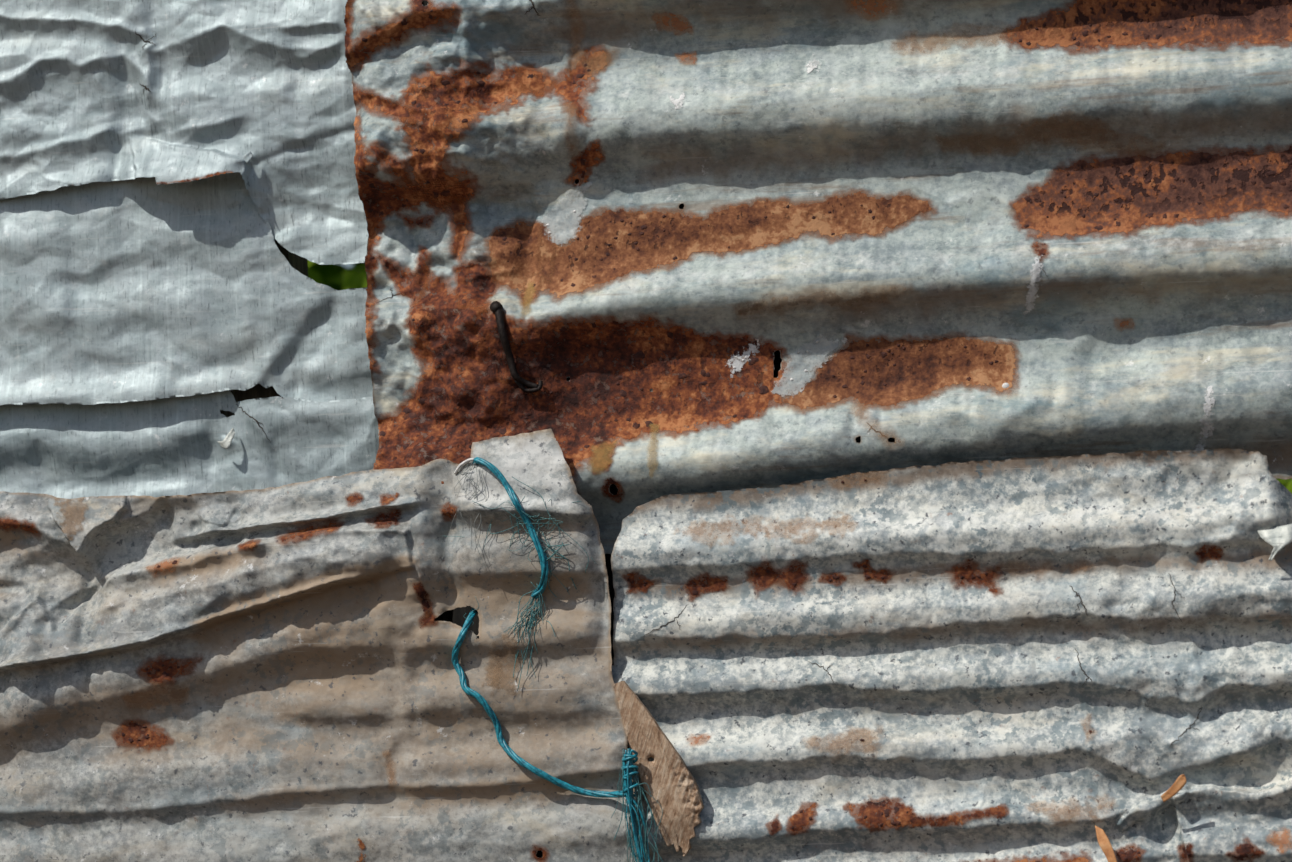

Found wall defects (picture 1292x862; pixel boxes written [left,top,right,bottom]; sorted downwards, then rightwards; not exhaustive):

rust [1003,0,1292,54]
rust [1009,145,1292,258]
rust [344,0,1018,502]
rust [366,493,401,528]
rust [685,554,891,601]
rust [951,559,1002,595]
rust [113,720,173,750]
rust [843,797,1009,832]
rust [978,852,1091,862]
rust [1115,844,1144,862]
rust [1178,843,1193,862]
rust [1226,829,1291,862]